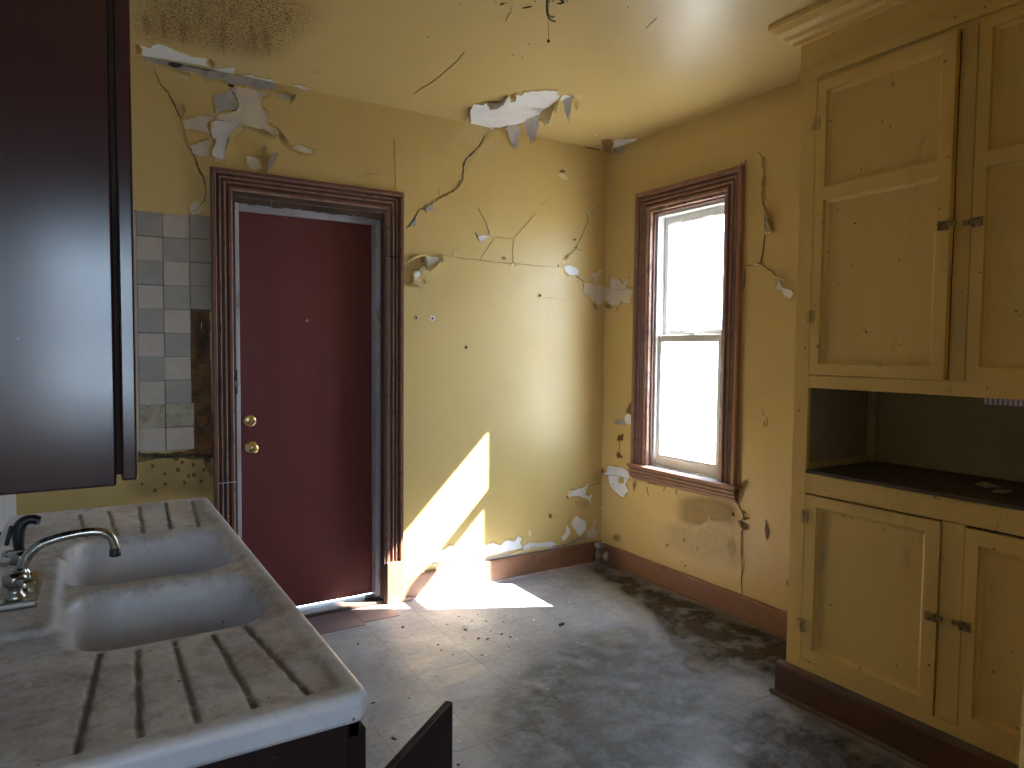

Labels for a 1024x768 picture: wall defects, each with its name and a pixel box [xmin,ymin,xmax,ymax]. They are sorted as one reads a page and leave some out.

mould [138,0,305,56]
crack [153,65,206,216]
peeling [135,33,318,174]
crack [414,52,465,94]
crack [406,135,485,229]
peeling [467,88,582,149]
peeling [404,253,444,289]
crack [445,204,601,299]
peeling [582,268,633,308]
peeling [404,463,677,571]
damp [683,500,731,542]
crack [737,503,745,589]